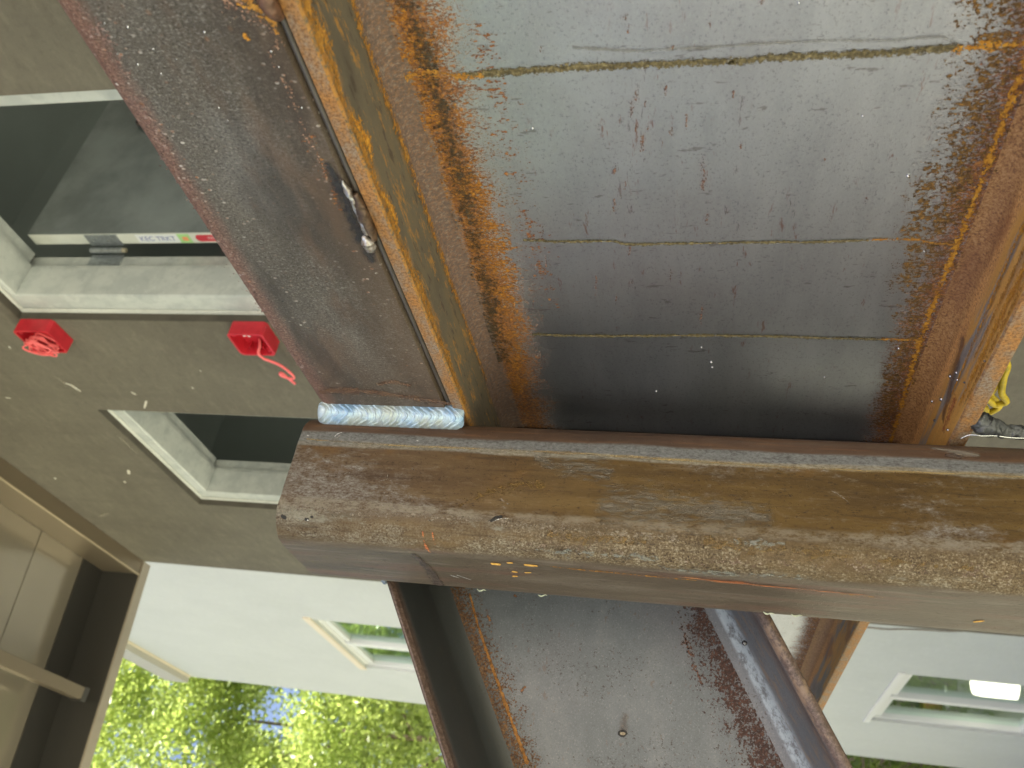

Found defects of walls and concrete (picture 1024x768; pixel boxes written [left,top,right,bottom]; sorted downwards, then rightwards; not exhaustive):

corrosion [222,0,342,212]
corrosion [301,0,487,404]
corrosion [385,0,562,395]
corrosion [869,0,1024,441]
corrosion [450,586,549,768]
corrosion [491,562,883,598]
corrosion [674,606,785,768]